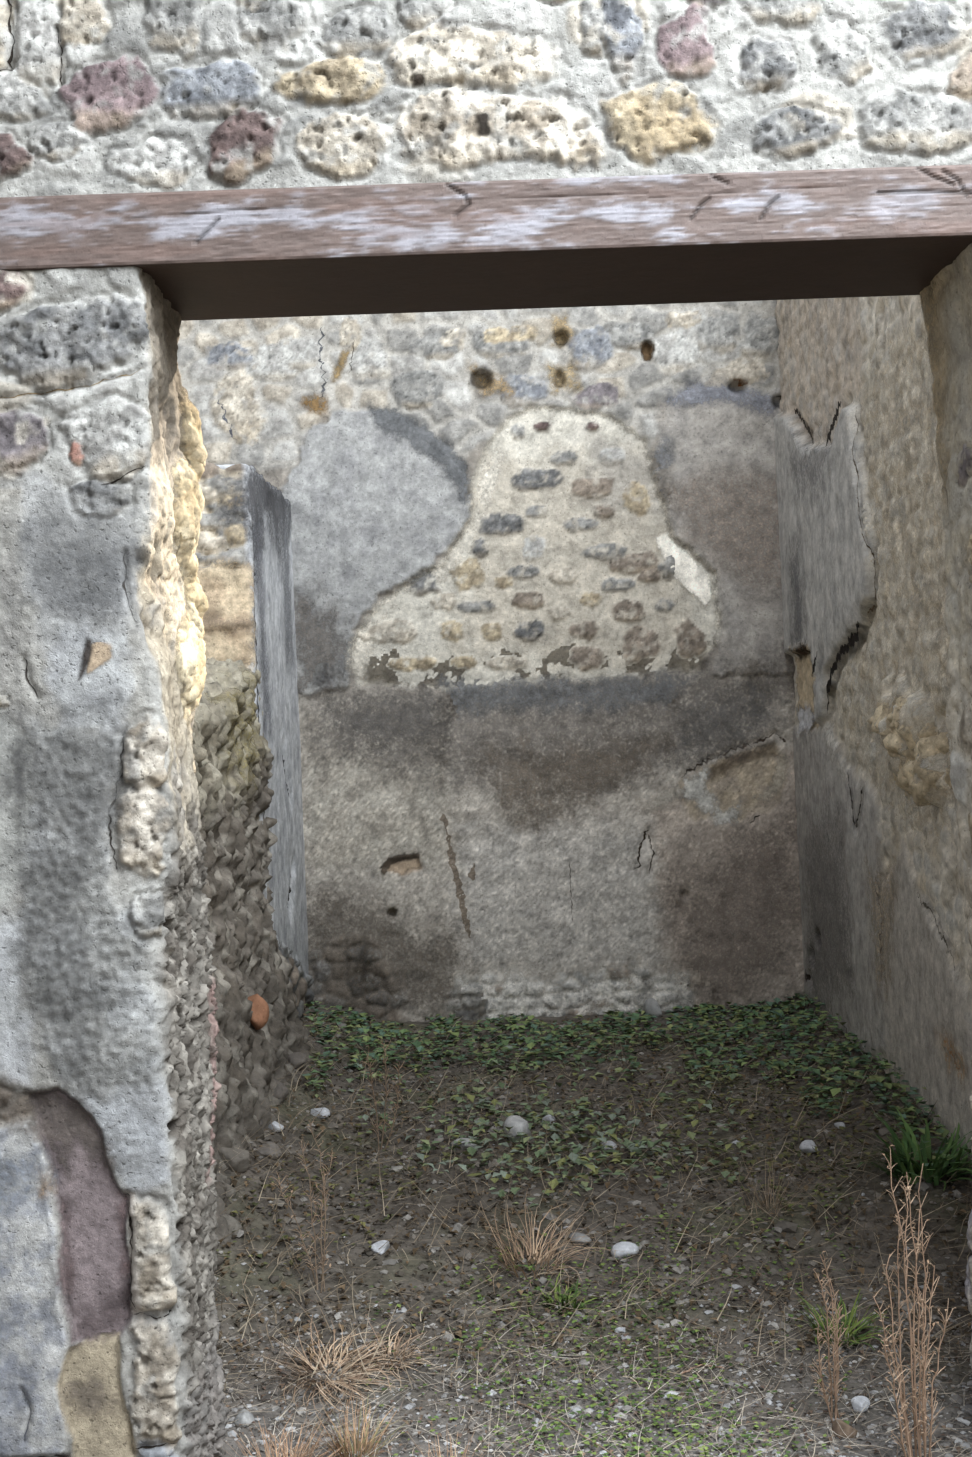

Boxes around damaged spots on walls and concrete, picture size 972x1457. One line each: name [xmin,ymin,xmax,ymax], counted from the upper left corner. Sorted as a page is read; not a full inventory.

damp [220,438,807,829]
spalling [348,406,723,691]
spalling [791,644,819,732]
spalling [380,853,421,875]
peeling [30,1090,134,1457]